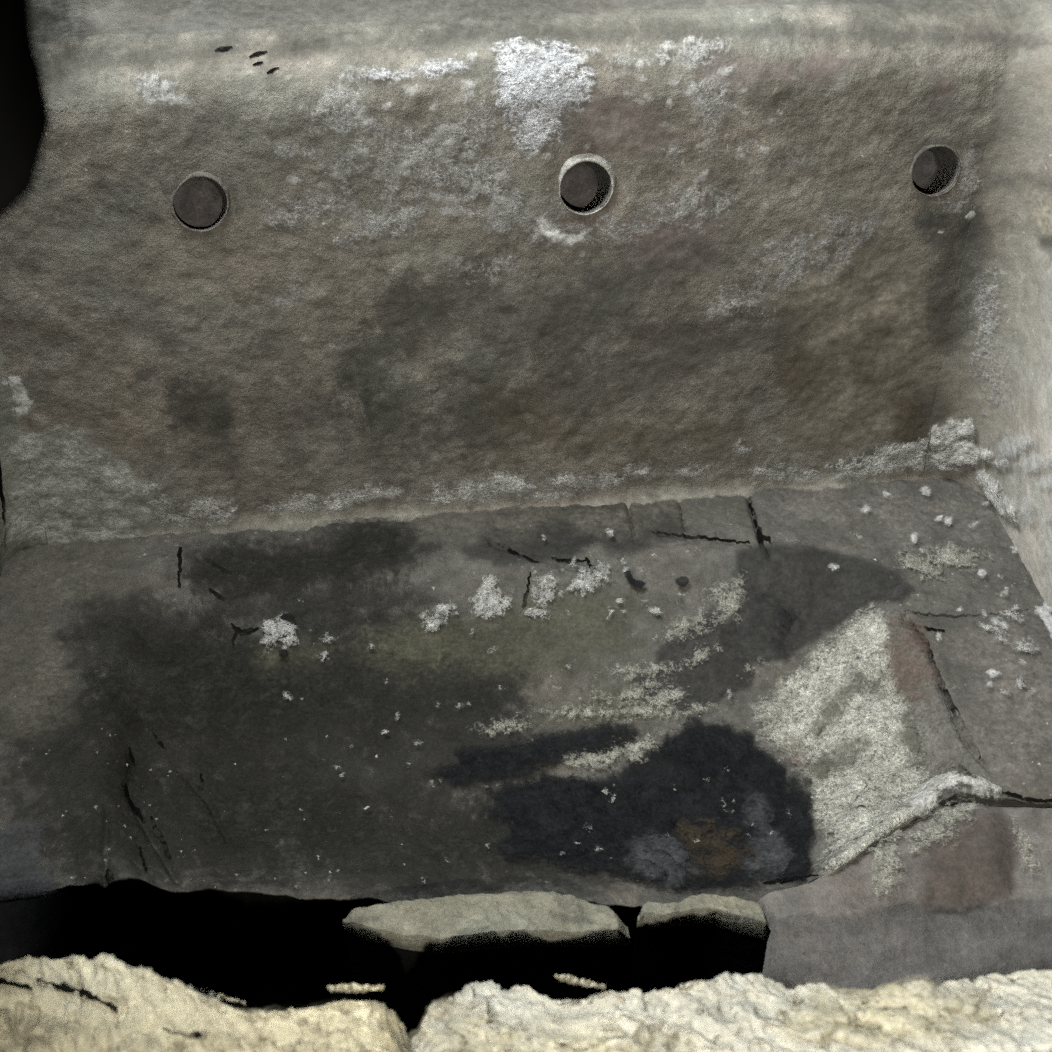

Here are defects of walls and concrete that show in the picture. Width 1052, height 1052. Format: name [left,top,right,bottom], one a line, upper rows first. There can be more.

water stain [259,27,730,256]
crack [0,462,8,547]
crack [629,499,772,545]
crack [496,543,596,608]
water stain [655,572,748,640]
water stain [480,712,527,737]
water stain [541,646,722,771]
water stain [754,604,1000,897]
crack [903,613,985,763]